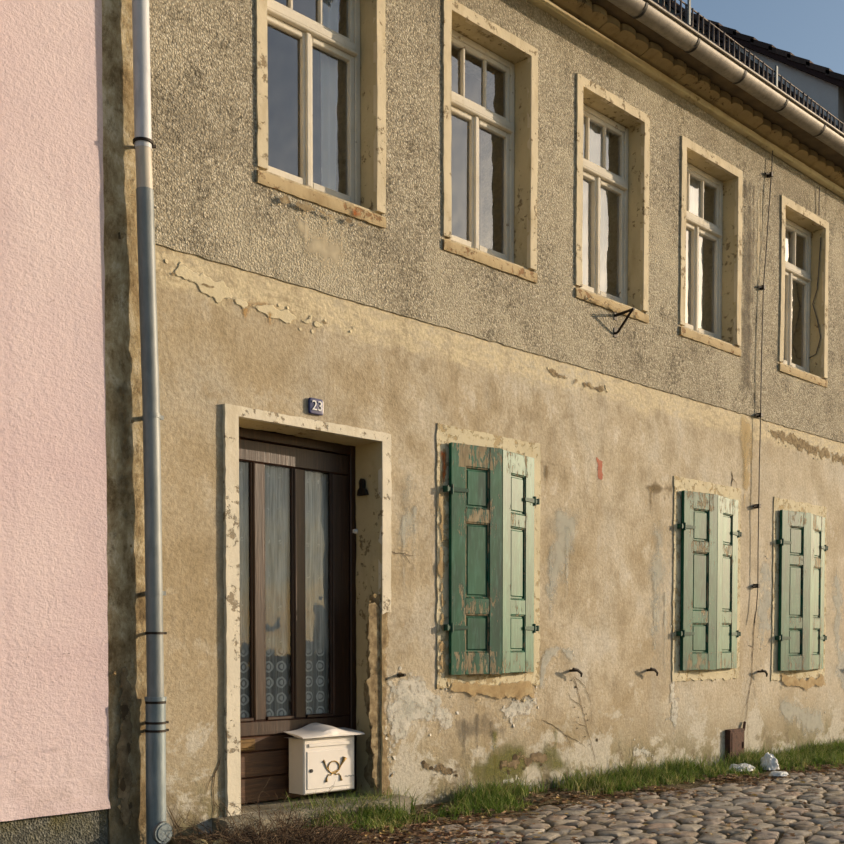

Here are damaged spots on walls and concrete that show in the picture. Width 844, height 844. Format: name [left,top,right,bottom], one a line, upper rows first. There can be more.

peeling [165,259,327,333]
spalling [547,367,608,392]
spalling [768,425,844,465]
spalling [438,482,447,631]
spalling [364,591,575,796]